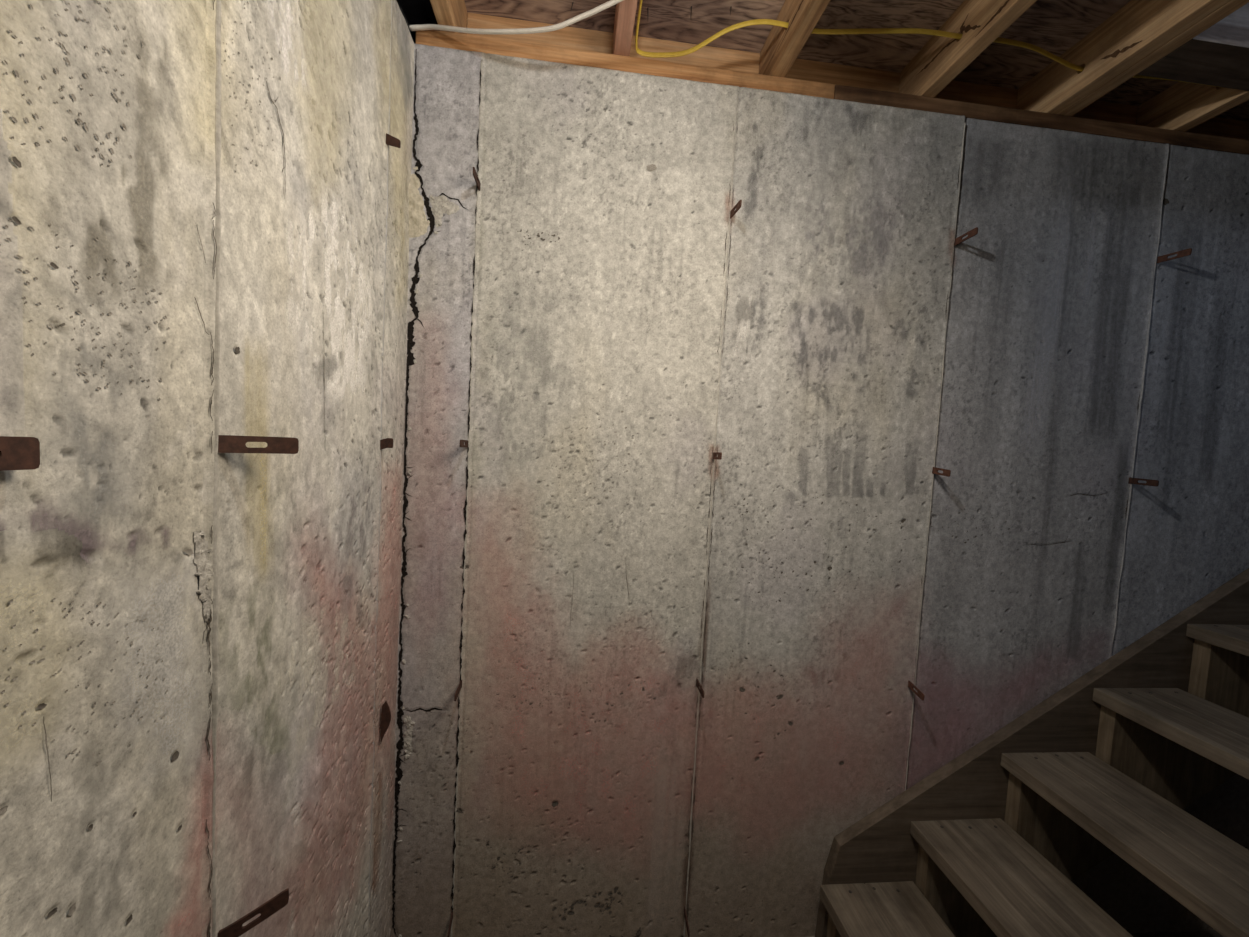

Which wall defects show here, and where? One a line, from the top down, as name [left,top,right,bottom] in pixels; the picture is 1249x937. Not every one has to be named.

crack [392,49,468,937]